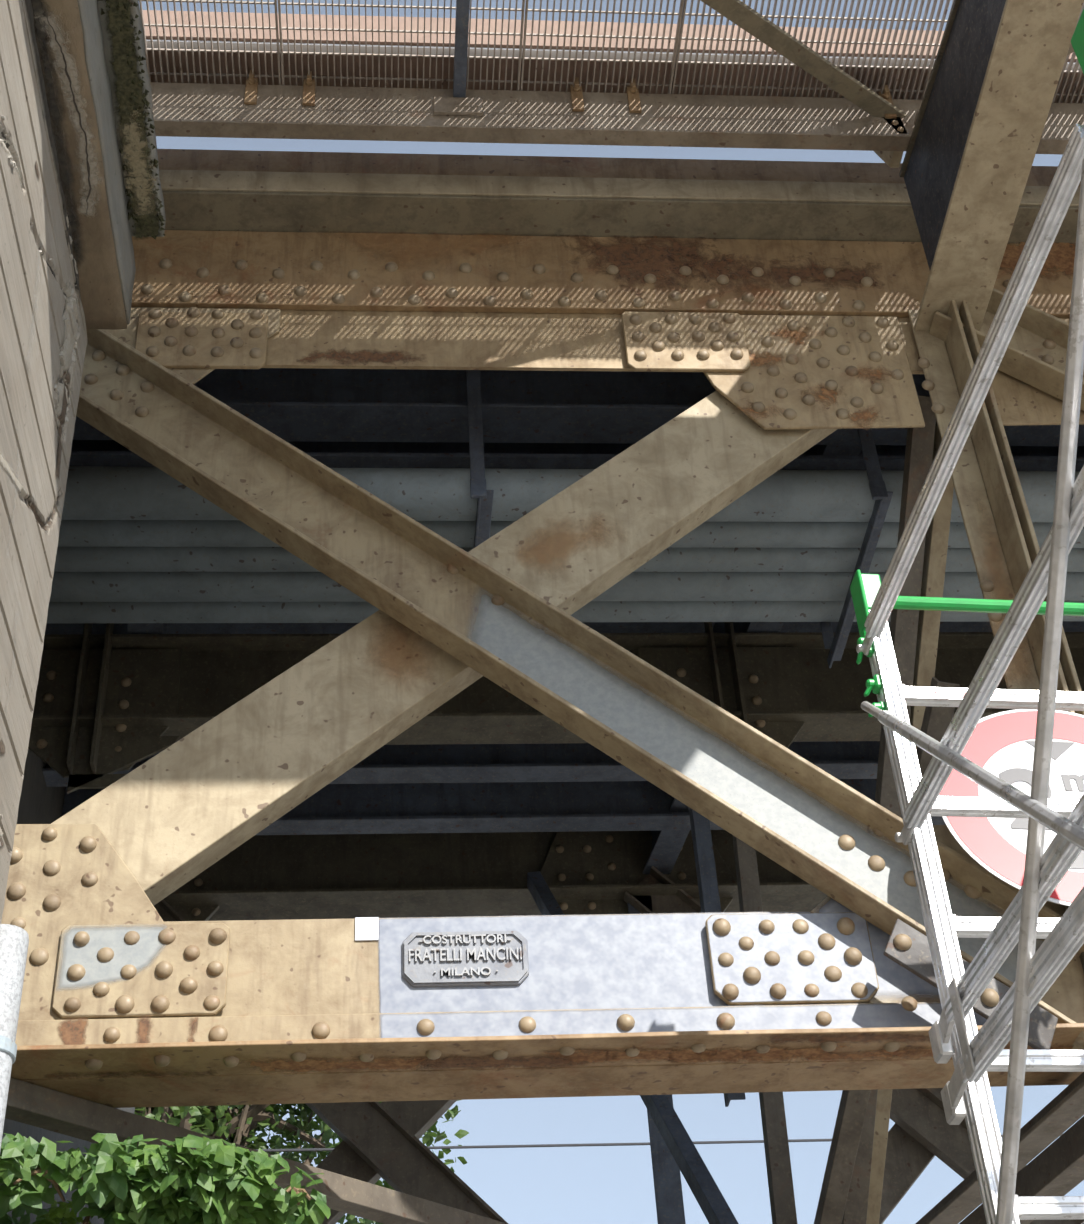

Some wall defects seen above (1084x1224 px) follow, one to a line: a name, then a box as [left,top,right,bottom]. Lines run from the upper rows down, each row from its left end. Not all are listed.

crack [38,14,101,216]
crack [0,116,24,192]
rust [575,235,878,295]
rust [297,350,421,364]
rust [749,353,782,366]
rust [59,1019,87,1045]
rust [137,1017,151,1043]